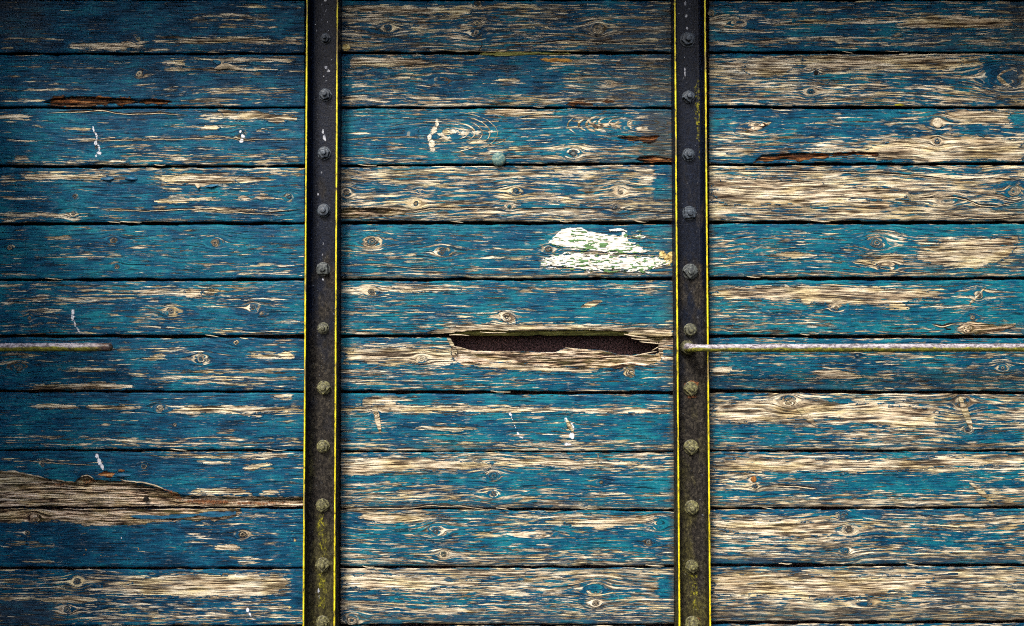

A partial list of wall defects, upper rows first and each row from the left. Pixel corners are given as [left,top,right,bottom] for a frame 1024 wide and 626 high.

peeling [98,469,131,479]
peeling [191,487,280,495]